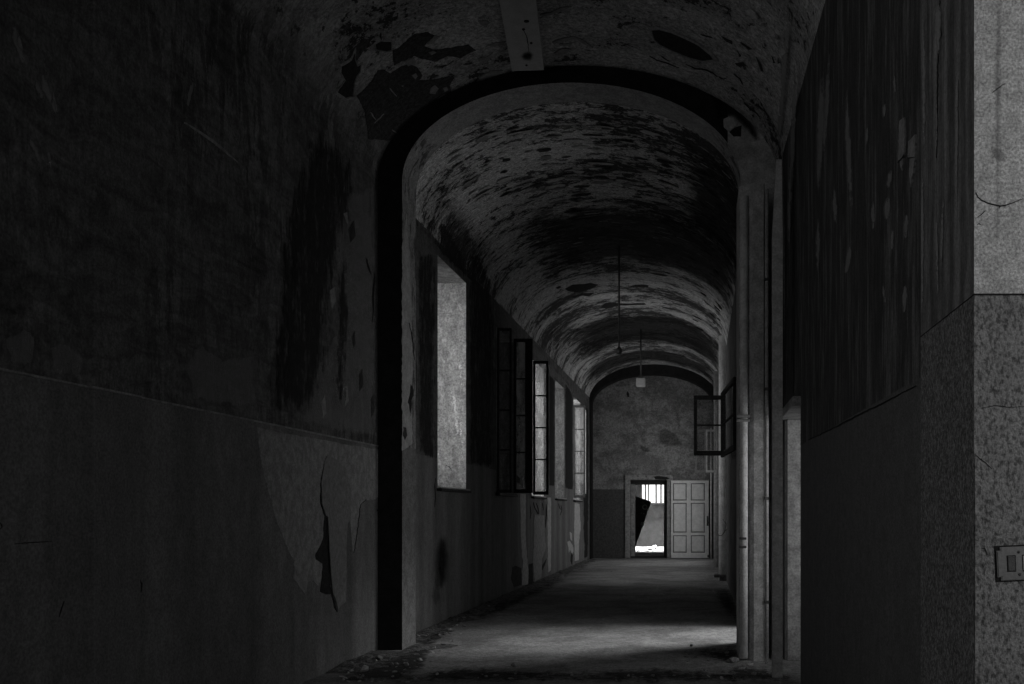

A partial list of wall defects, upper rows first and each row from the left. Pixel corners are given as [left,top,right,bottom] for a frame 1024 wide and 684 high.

peeling [335,32,476,141]
water stain [270,134,352,410]
crack [976,193,1023,225]
peeling [257,427,378,611]